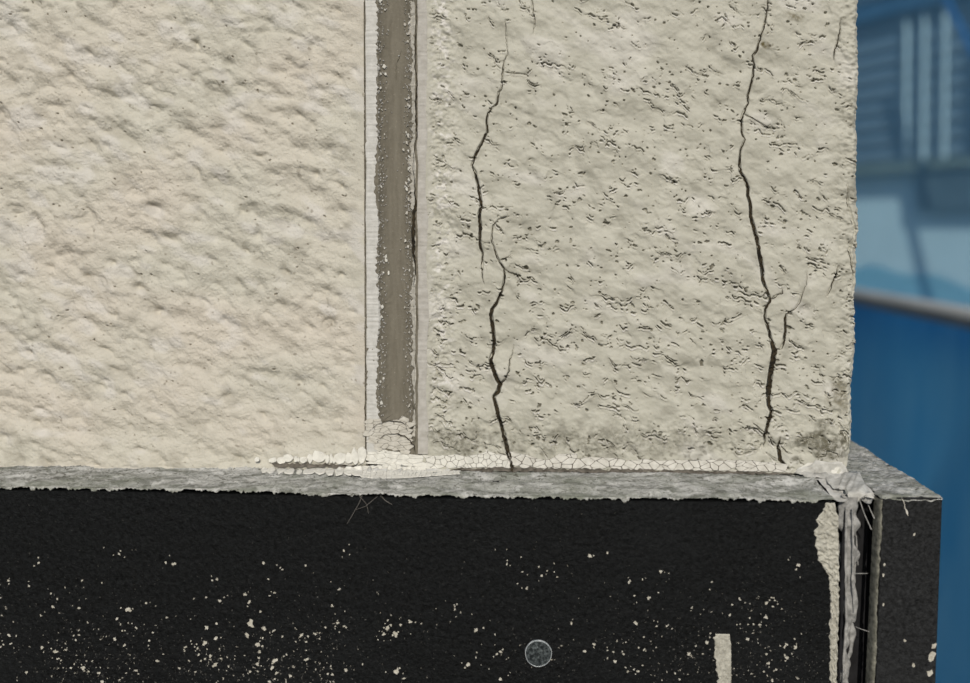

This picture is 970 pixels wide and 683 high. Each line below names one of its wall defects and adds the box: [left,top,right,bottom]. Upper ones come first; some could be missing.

peeling [254,0,874,501]
crack [450,0,807,475]
peeling [183,622,245,679]
peeling [245,611,292,683]
peeling [687,596,779,683]
peeling [814,502,840,683]